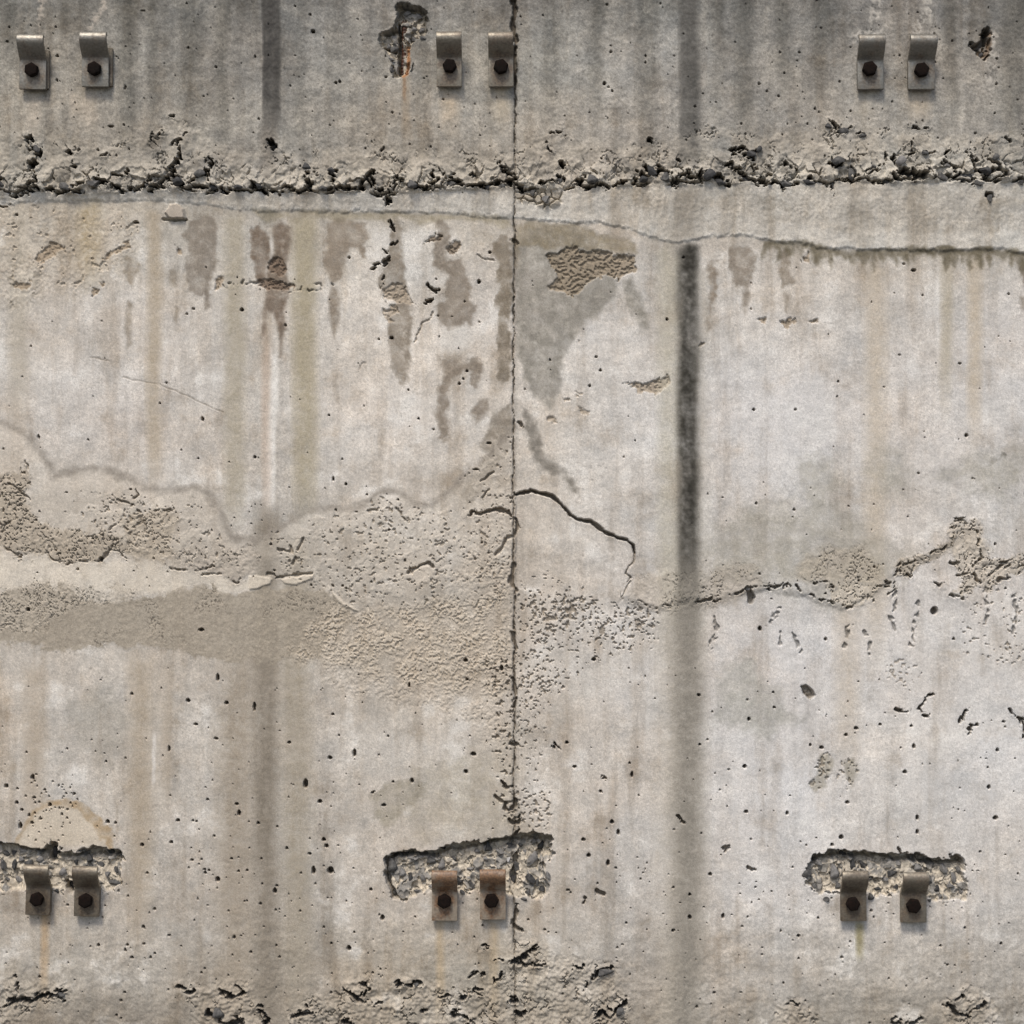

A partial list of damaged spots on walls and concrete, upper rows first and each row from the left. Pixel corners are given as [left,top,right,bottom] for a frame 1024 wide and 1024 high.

water stain [257,0,282,157]
spalling [0,114,1024,323]
crack [624,175,1024,189]
water stain [0,198,582,592]
crack [0,0,675,835]
peeling [0,466,683,902]
water stain [490,186,1024,1024]
crack [694,517,1024,611]
water stain [207,654,318,1024]
spalling [287,936,634,1024]
crack [509,895,525,1024]
spalling [802,849,969,902]